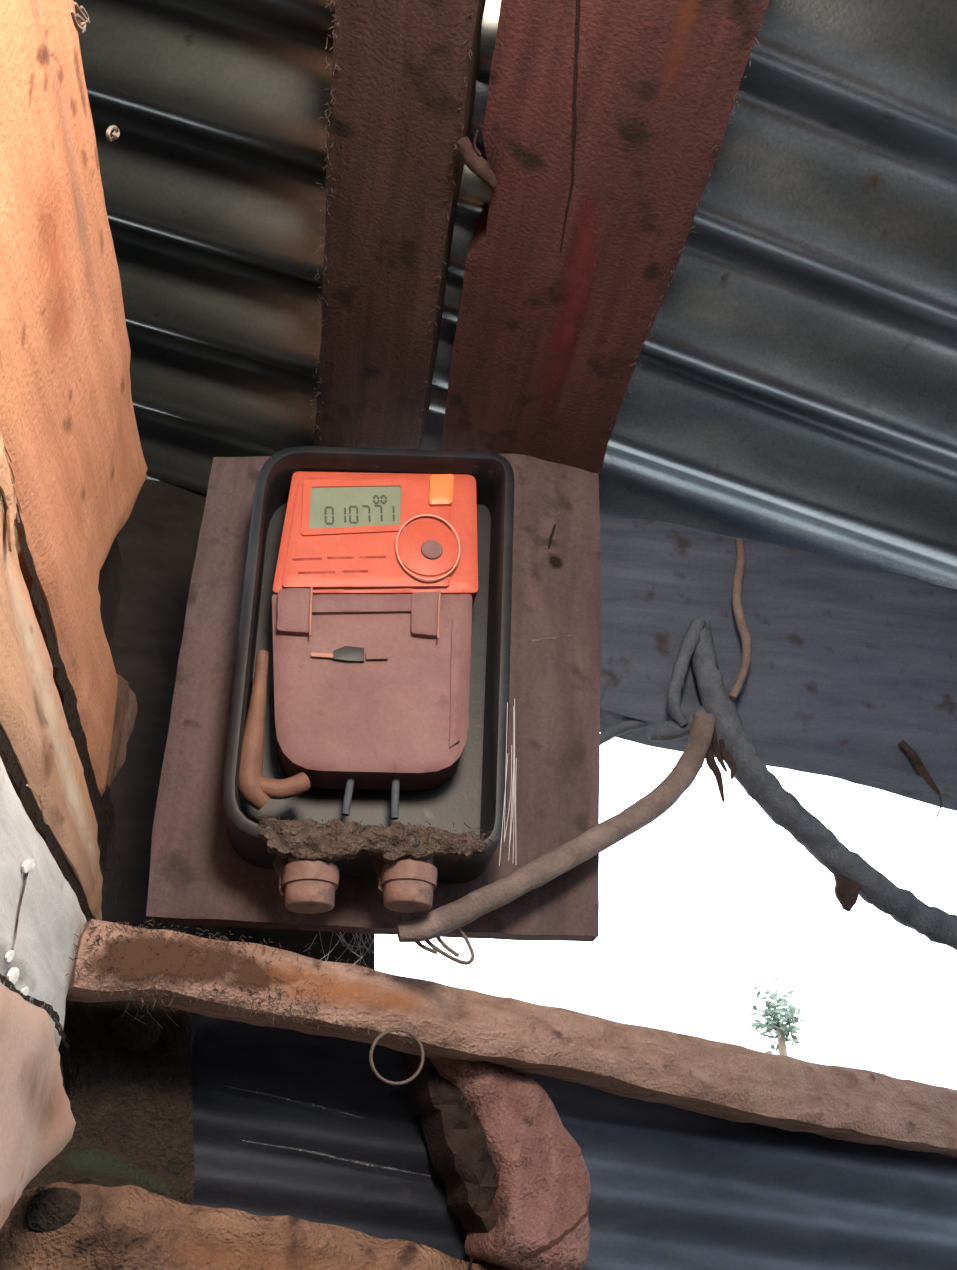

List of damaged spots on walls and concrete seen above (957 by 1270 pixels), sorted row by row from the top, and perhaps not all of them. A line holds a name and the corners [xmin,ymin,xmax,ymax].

crack [560,0,580,252]
crack [467,1210,589,1270]